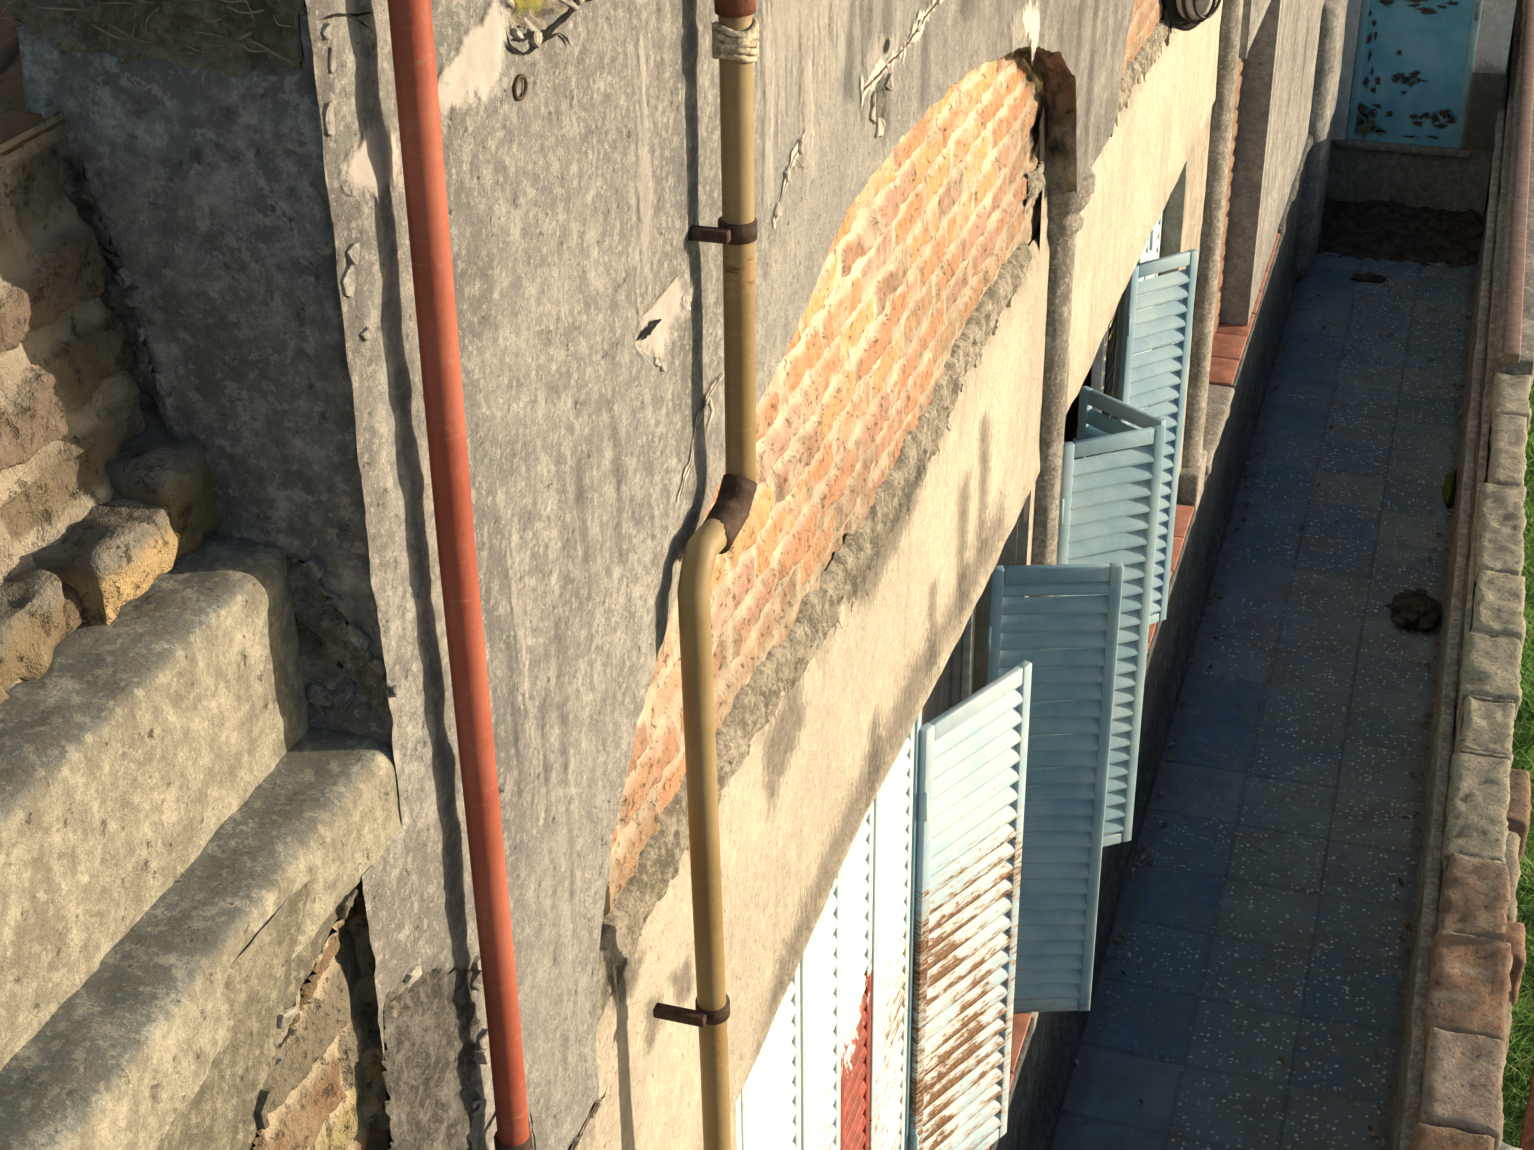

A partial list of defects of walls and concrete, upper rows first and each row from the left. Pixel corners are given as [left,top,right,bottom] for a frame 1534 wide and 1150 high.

flaking render [0,0,307,78]
spalling [318,101,335,137]
flaking render [502,0,593,48]
flaking render [869,73,894,138]
crack [861,0,943,106]
spalling [1026,106,1048,213]
peeling [1355,0,1459,139]
spalling [336,242,360,298]
flaking render [634,273,694,372]
flaking render [715,240,1032,806]
flaking render [596,773,690,1024]
flaking render [252,880,489,1150]